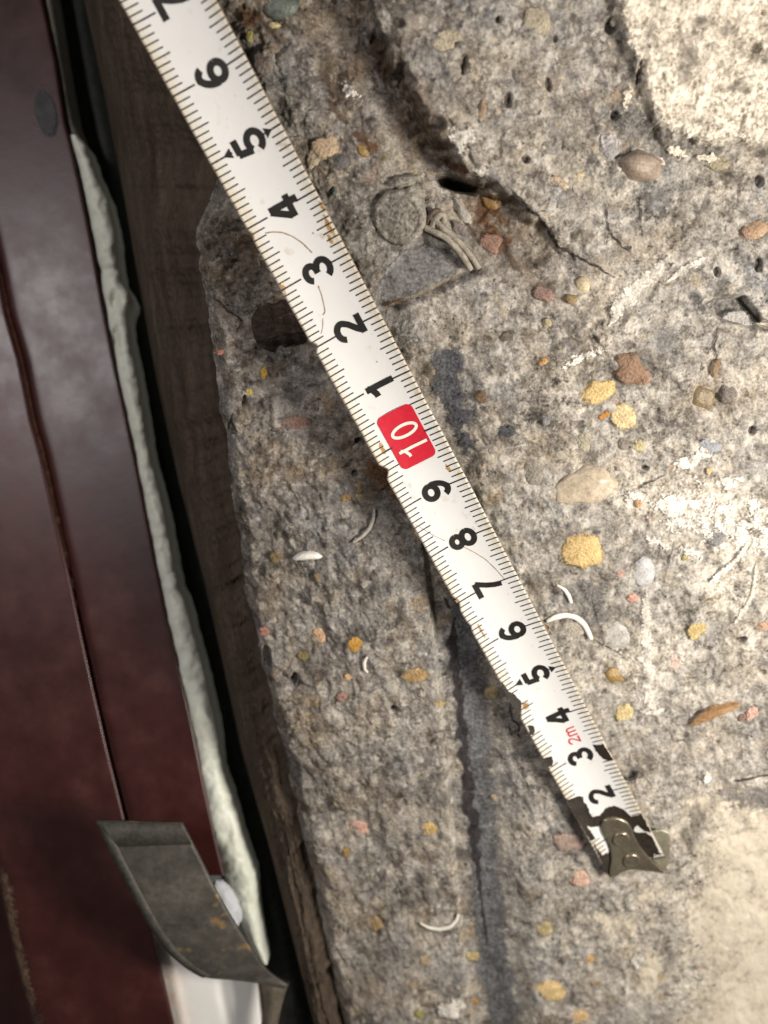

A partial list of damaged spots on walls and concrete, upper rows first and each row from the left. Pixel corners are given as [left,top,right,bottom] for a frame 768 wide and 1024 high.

crack [447,115,476,166]
crack [511,189,651,276]
crack [444,597,488,945]